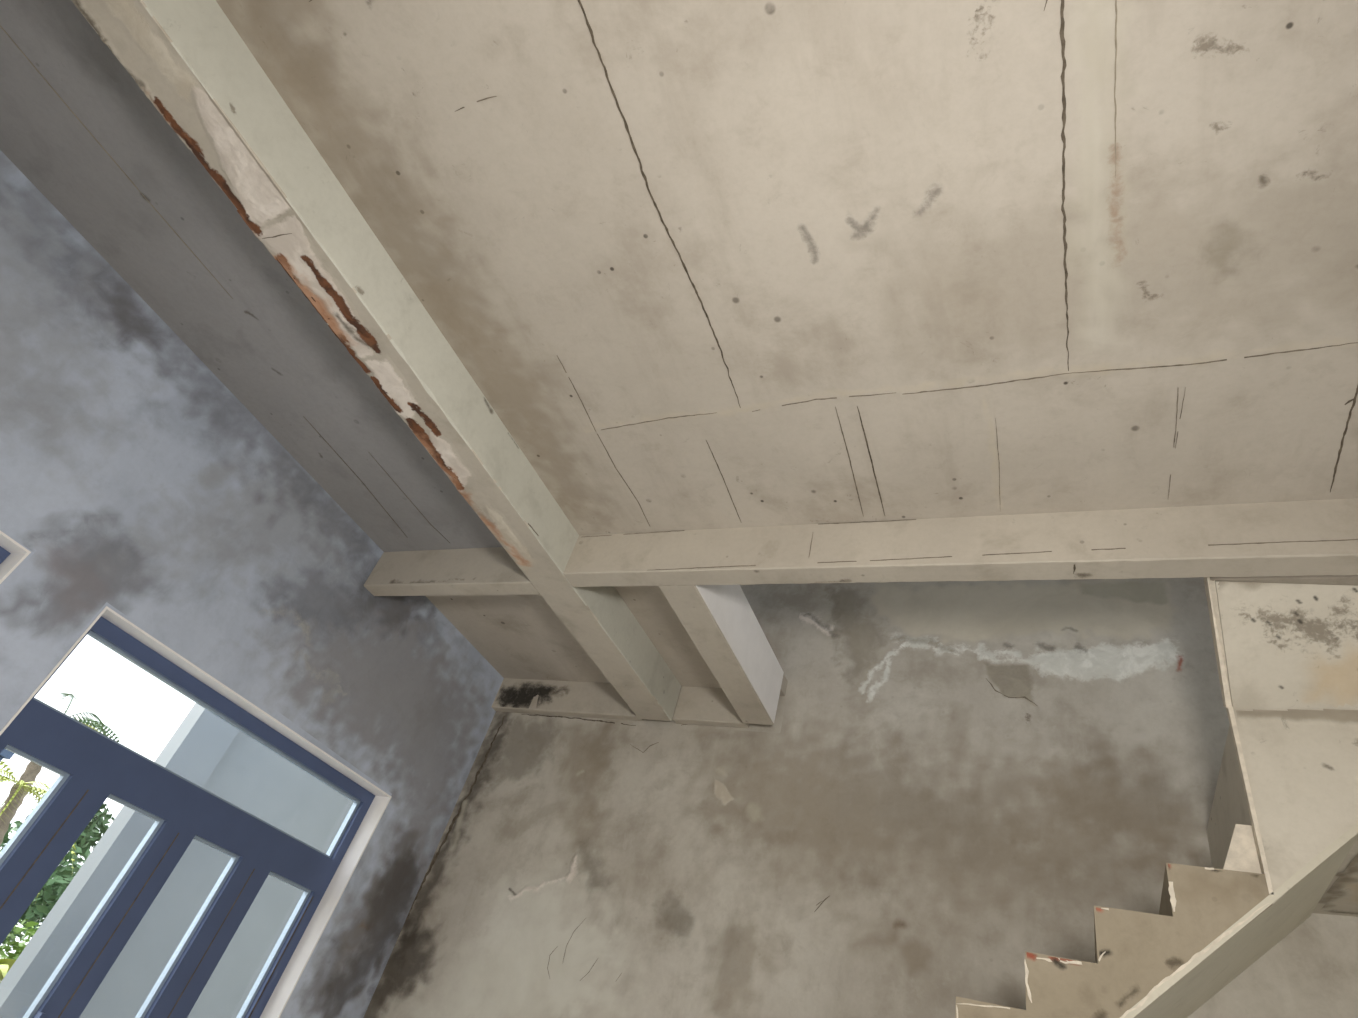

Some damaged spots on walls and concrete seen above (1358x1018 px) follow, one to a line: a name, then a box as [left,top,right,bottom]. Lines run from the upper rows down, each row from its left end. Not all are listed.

flaking render [72,0,363,320]
rust [149,92,538,570]
flaking render [355,348,476,488]
water stain [0,150,1266,1018]
crack [578,0,741,408]
water stain [956,0,1013,72]
crack [1044,0,1069,371]
water stain [788,23,1358,500]
water stain [1219,582,1358,666]
crack [1330,385,1358,492]